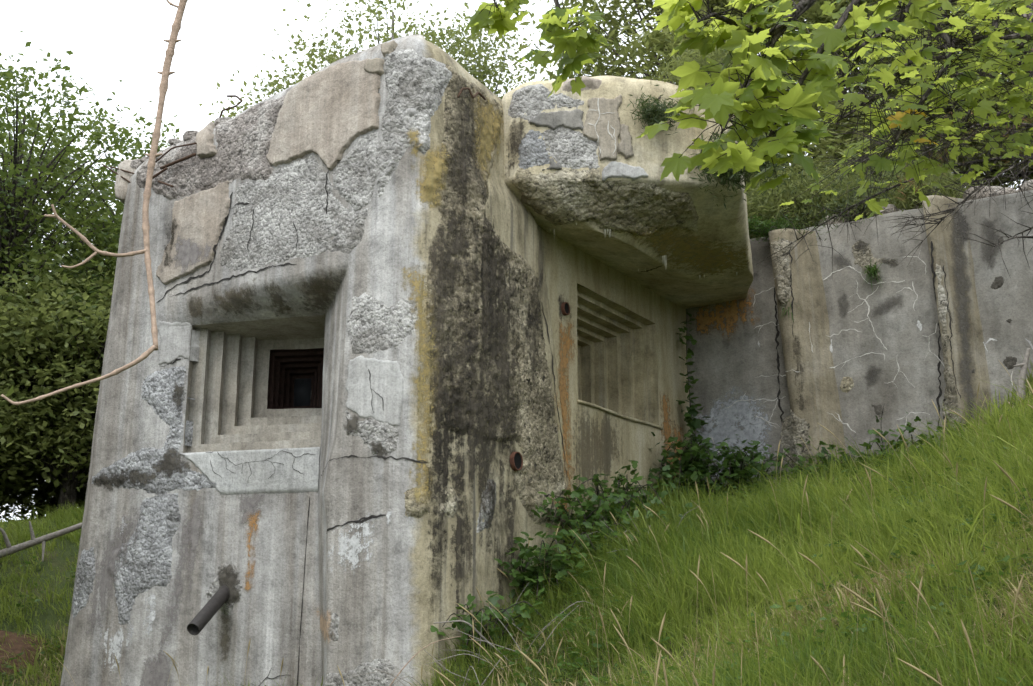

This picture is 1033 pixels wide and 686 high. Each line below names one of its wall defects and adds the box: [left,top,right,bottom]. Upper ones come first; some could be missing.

spalling [92,321,217,625]
rust [245,513,259,590]
crack [206,451,428,479]
crack [326,514,386,534]
spalling [136,40,699,524]
water stain [403,76,543,620]
rust [555,322,574,520]
crack [727,370,796,427]
crack [753,243,961,432]
spalling [322,659,395,686]